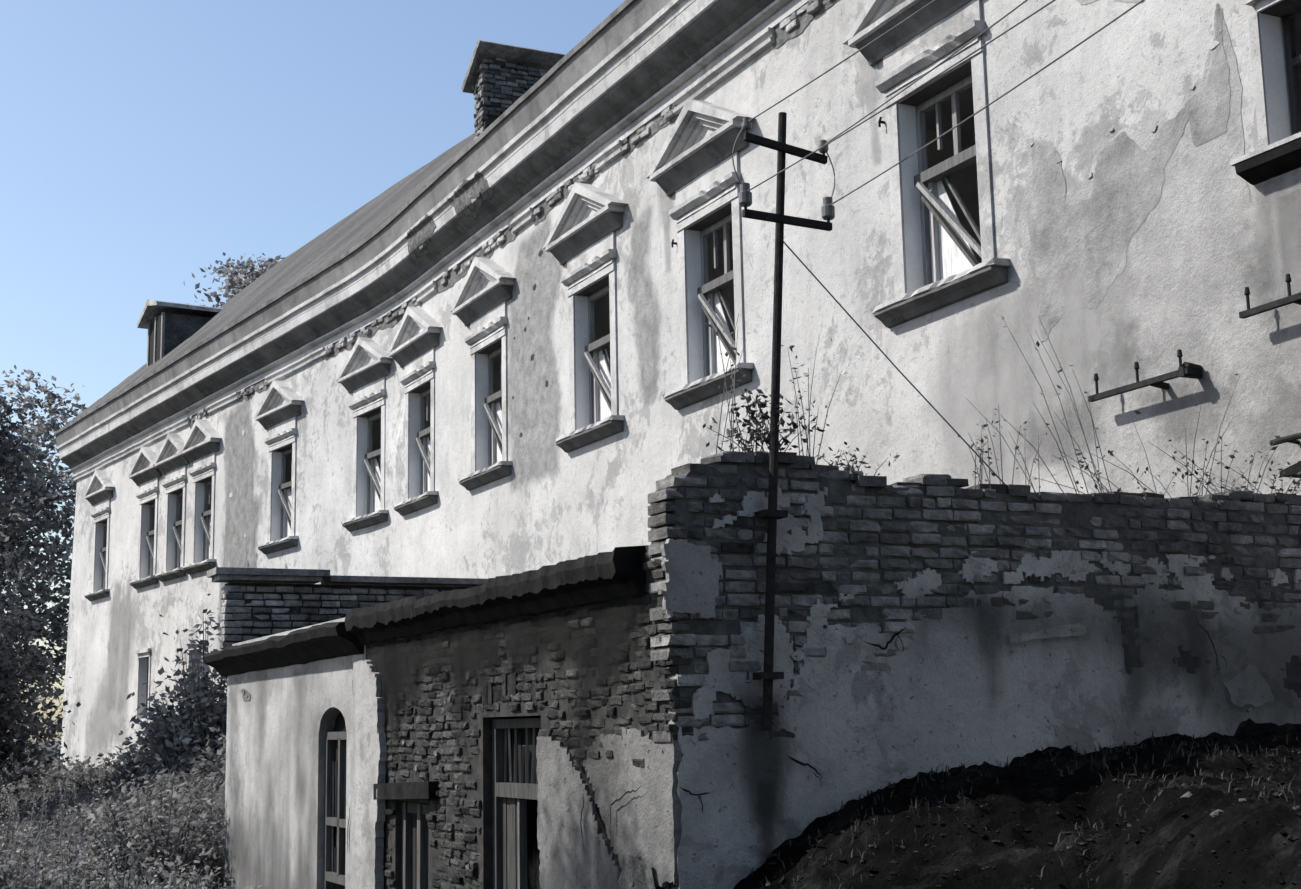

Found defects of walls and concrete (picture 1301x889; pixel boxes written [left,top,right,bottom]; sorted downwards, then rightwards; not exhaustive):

leakage [659,189,671,268]
flaking render [384,0,1301,889]
crack [866,628,906,652]
crack [787,755,822,784]